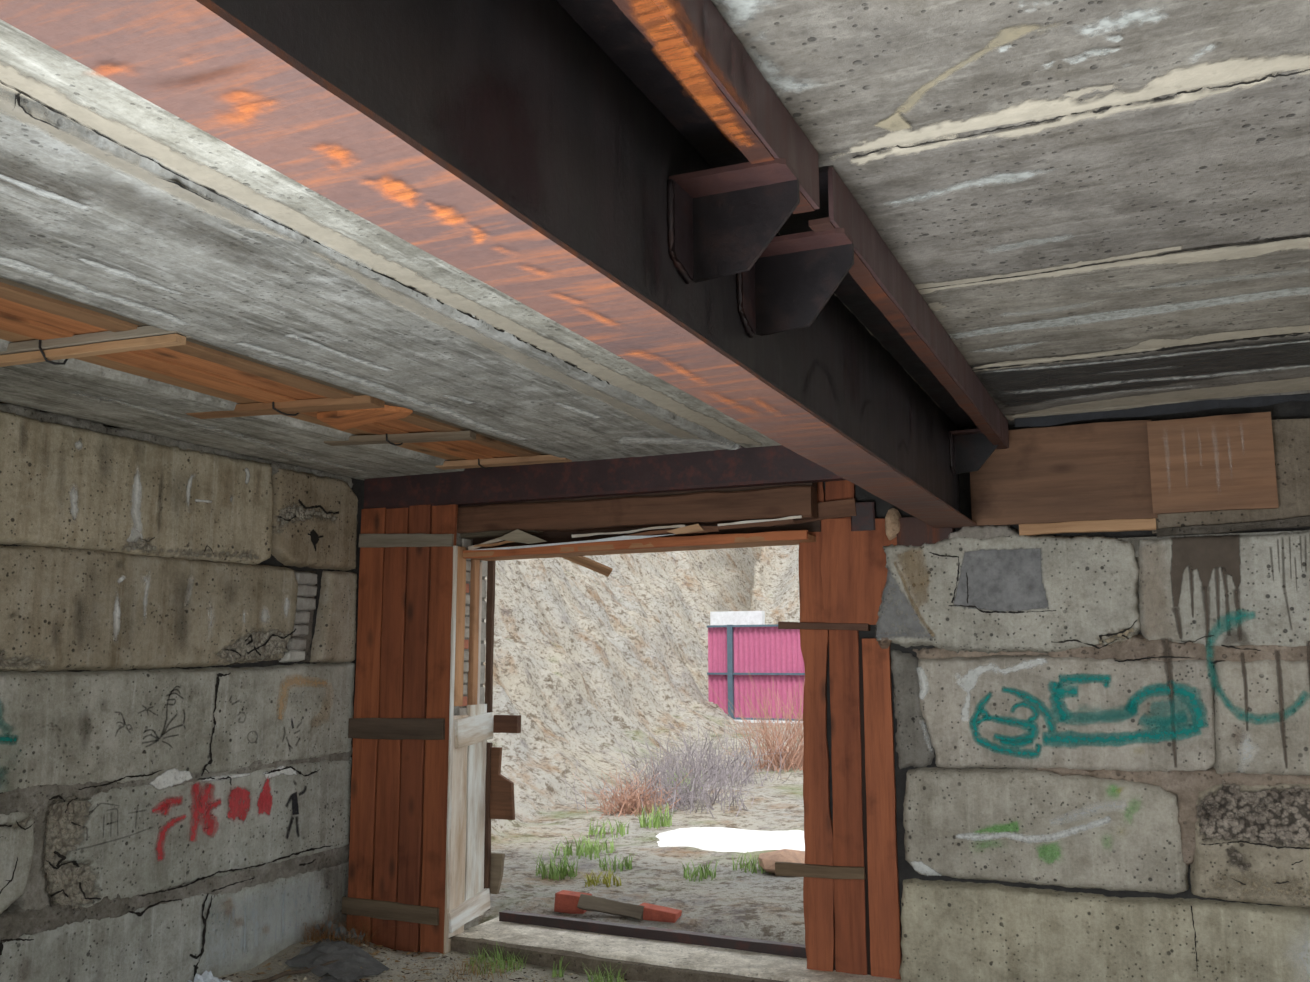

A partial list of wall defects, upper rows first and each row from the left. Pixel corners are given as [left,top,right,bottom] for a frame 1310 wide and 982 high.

corrosion [632,0,752,146]
flaking render [832,55,1310,165]
corrosion [381,181,414,205]
damp [1270,538,1306,625]
spalling [217,628,296,664]
damp [1163,535,1248,767]
crack [198,672,232,785]
damp [1275,651,1288,768]
spalling [0,797,101,909]
crack [49,770,161,802]
spalling [1196,781,1310,870]
crack [129,845,333,978]